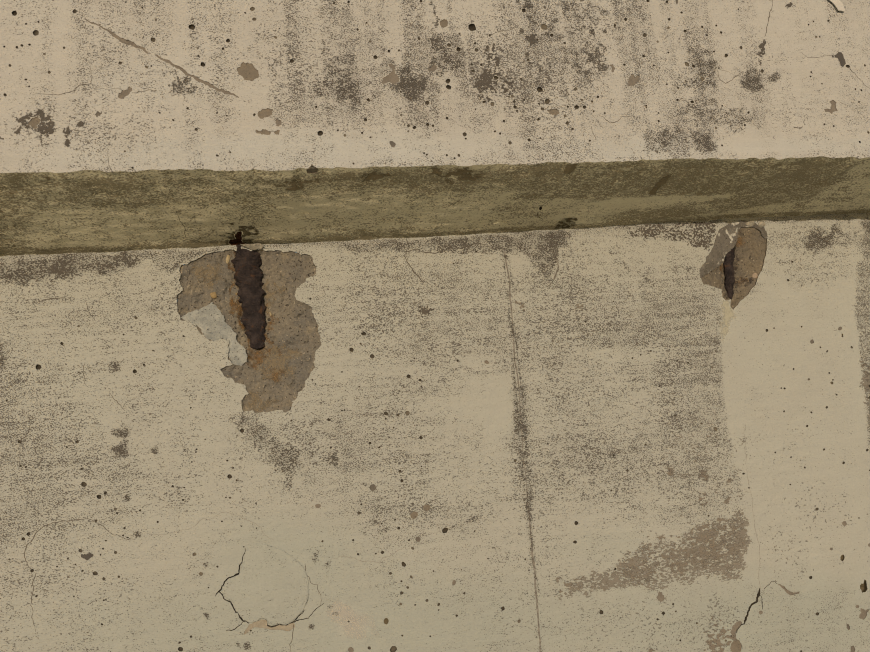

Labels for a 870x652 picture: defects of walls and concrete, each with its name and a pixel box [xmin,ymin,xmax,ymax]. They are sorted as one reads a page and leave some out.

corrosion [219,223,259,246]
spalling [700,220,767,309]
spalling [177,231,321,413]
crack [24,502,274,632]
crack [215,550,324,651]